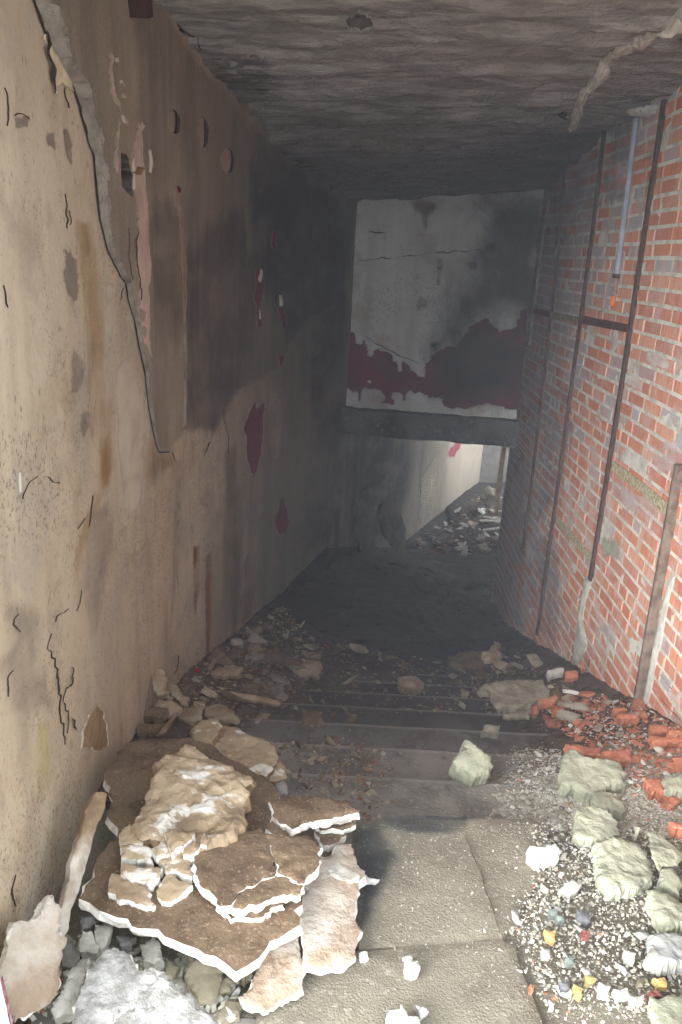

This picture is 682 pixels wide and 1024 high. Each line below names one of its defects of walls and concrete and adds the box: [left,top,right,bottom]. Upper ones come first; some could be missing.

crack [177,25,202,50]
spalling [567,8,682,132]
crack [33,0,177,462]
peeling [108,51,154,359]
crack [353,231,483,268]
peeling [347,308,529,411]
peeling [242,401,266,480]
crack [78,495,93,529]
crack [47,590,82,745]
spalling [80,704,109,753]